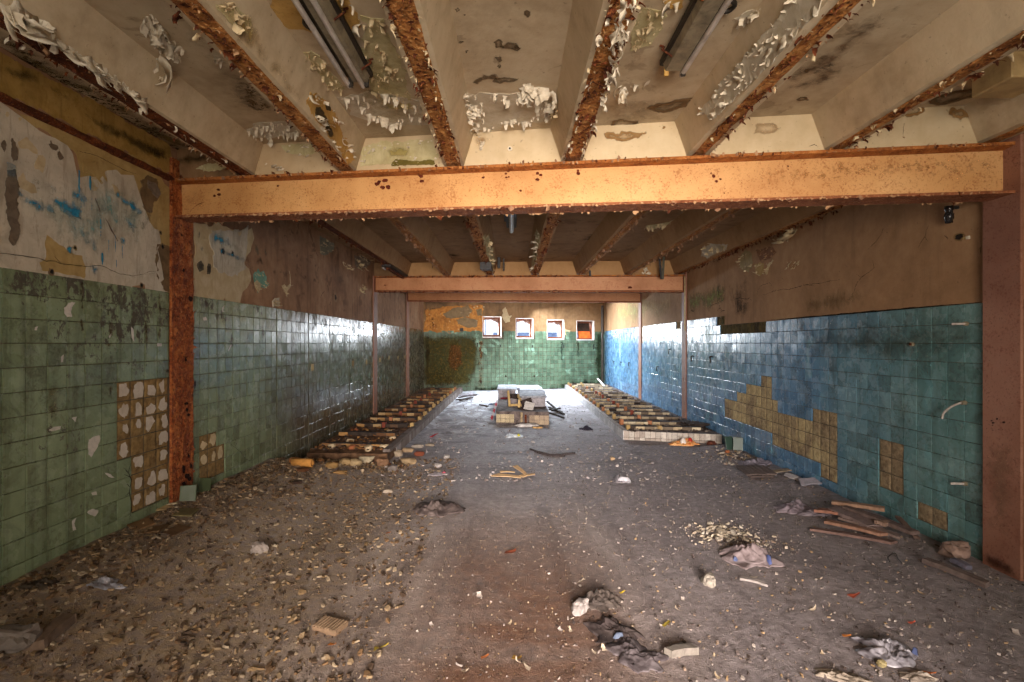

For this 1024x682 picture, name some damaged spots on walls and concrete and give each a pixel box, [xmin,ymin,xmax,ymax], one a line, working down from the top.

peeling [0,0,149,115]
rust [4,3,373,181]
peeling [303,0,439,183]
rust [379,0,489,171]
peeling [463,83,558,151]
rust [504,0,663,168]
peeling [696,0,822,120]
rust [695,0,875,158]
rust [826,30,1024,154]
peeling [0,102,170,295]
peeling [193,222,269,312]
peeling [117,378,169,513]